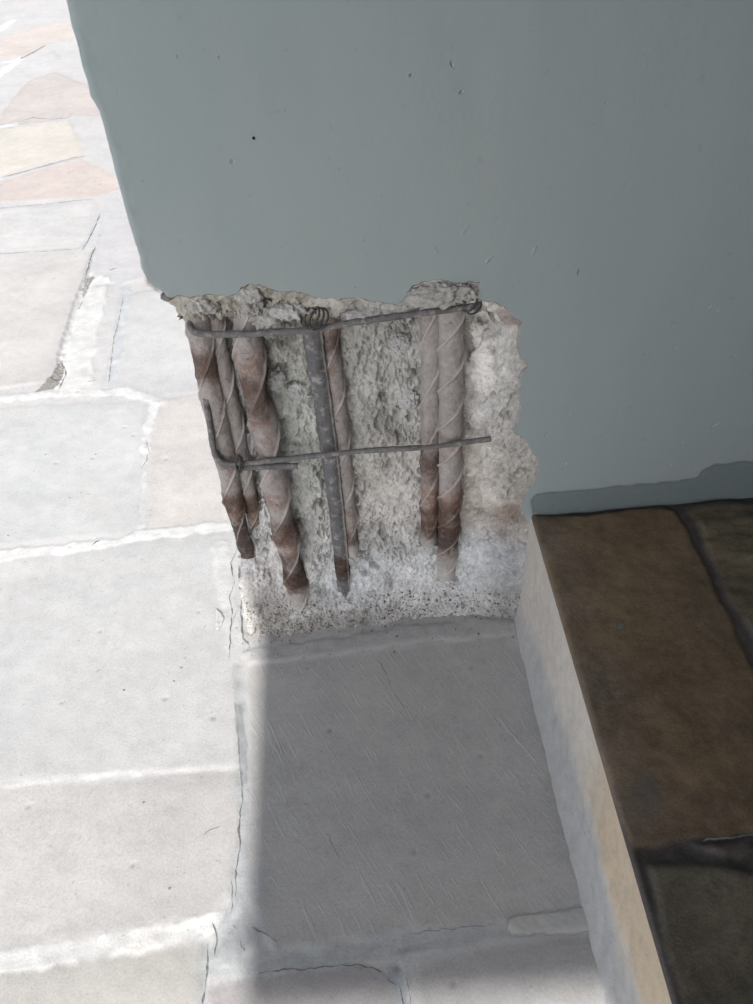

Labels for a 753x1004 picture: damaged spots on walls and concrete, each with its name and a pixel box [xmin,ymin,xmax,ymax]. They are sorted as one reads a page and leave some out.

corrosion [191,353,218,379]
spalling [160,279,540,638]
corrosion [419,454,439,479]
corrosion [222,494,261,517]
corrosion [271,518,300,546]
corrosion [419,505,462,539]
corrosion [283,562,307,588]